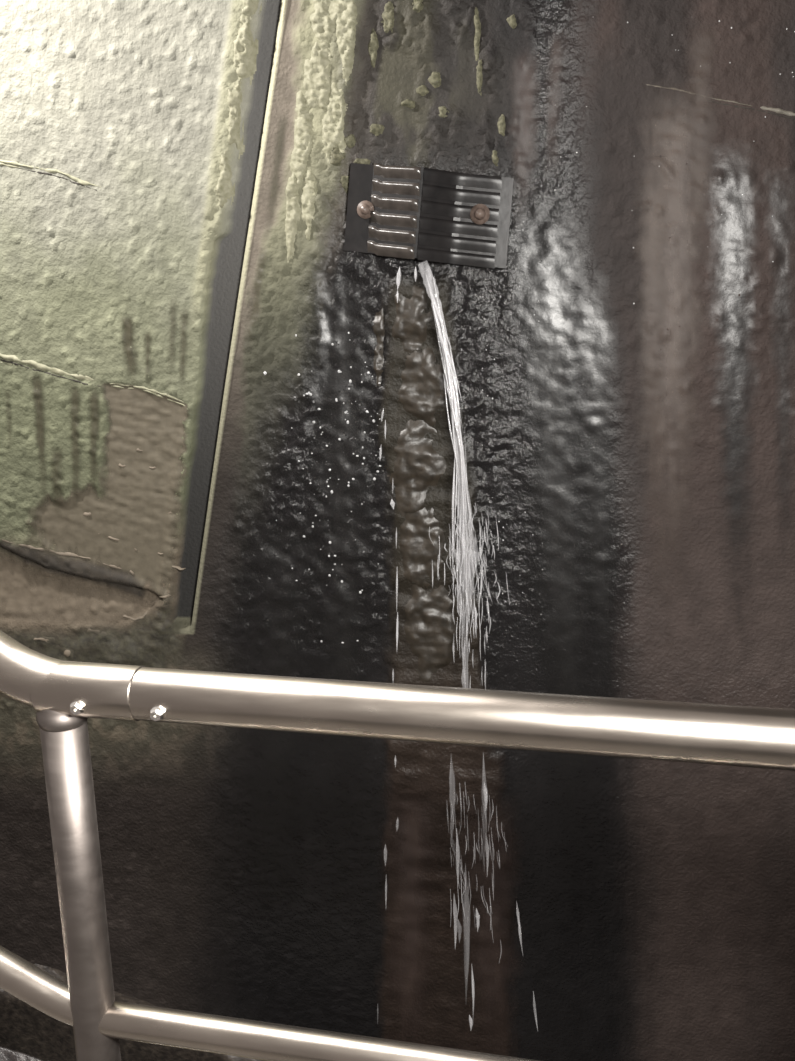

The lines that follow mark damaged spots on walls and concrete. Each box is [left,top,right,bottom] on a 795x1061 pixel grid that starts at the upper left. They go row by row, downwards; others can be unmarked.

crack [0,160,101,191]
water stain [272,0,358,263]
crack [646,84,795,119]
peeling [0,384,188,668]